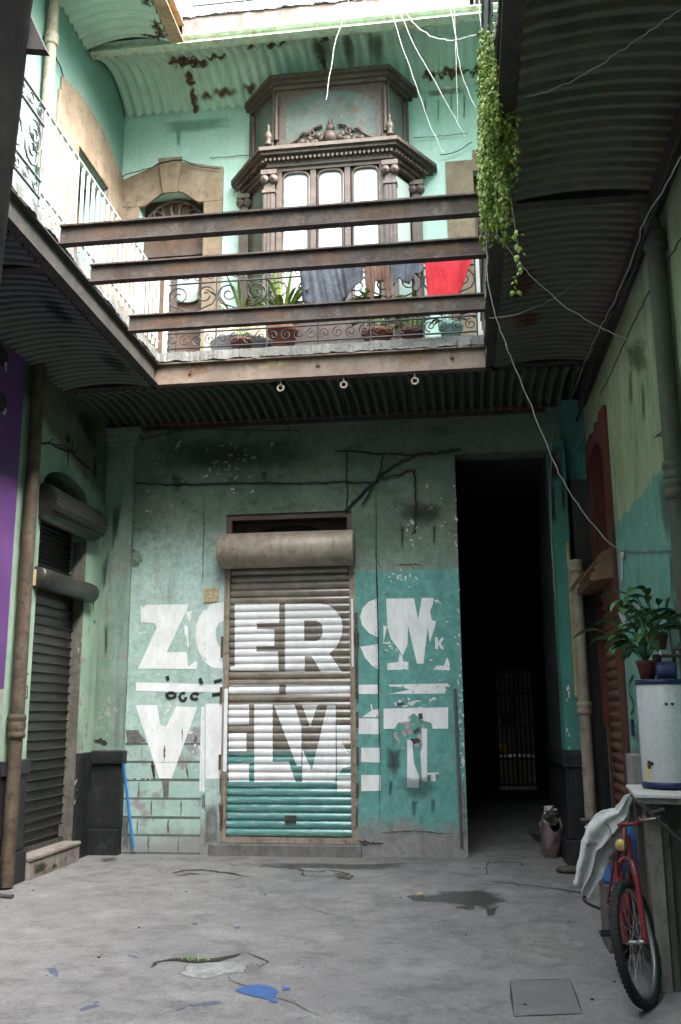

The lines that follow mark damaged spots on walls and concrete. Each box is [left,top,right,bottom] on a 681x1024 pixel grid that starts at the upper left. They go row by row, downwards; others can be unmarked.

rust [168,53,232,114]
flaking render [76,602,201,855]
water stain [409,890,503,916]